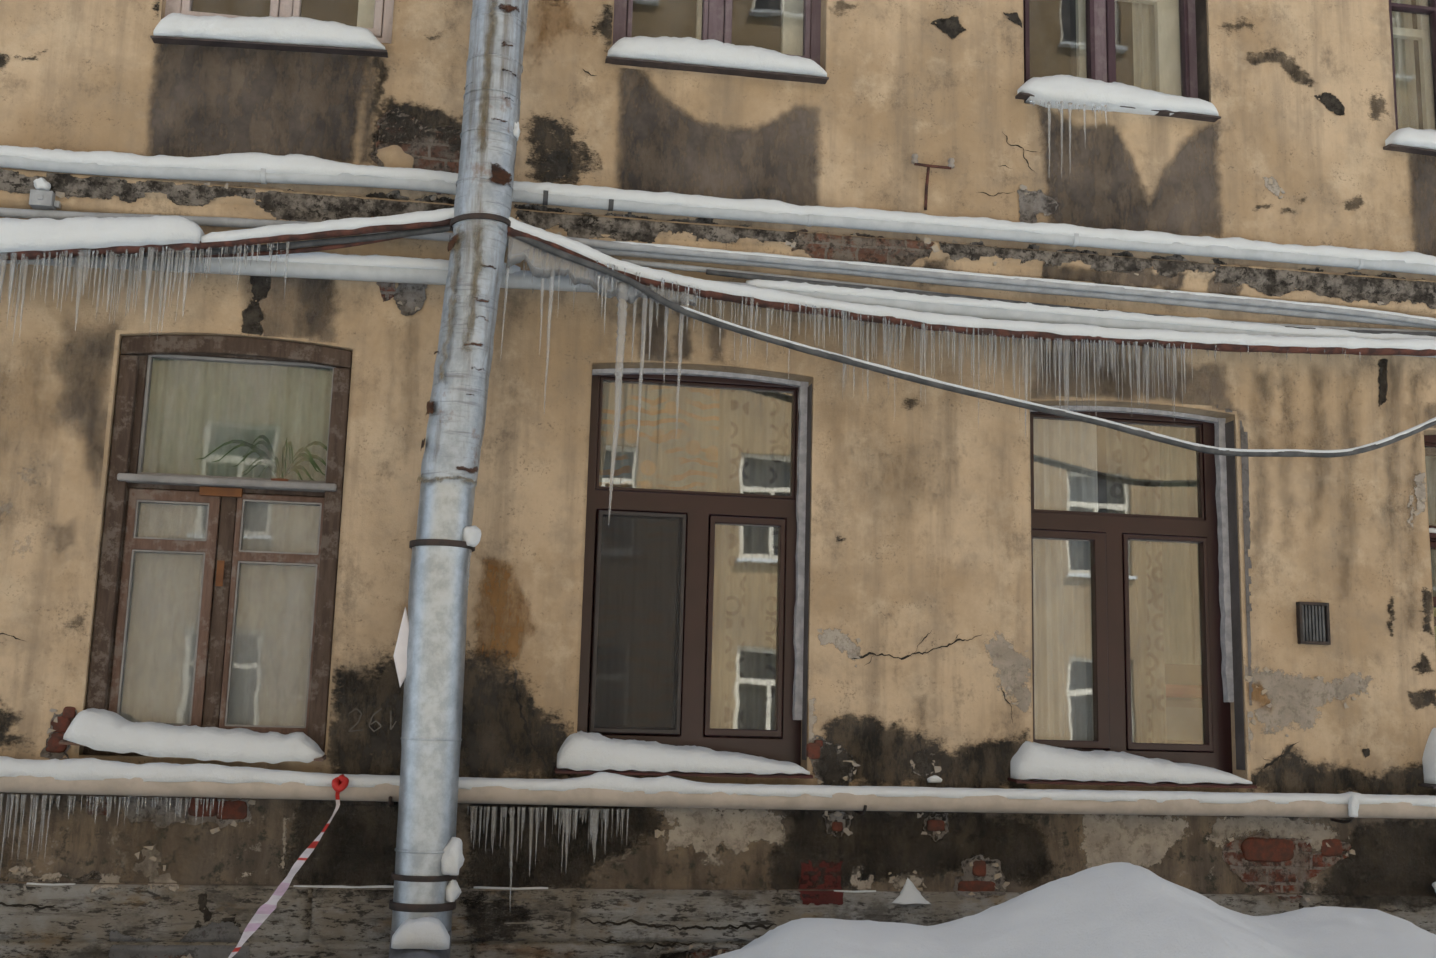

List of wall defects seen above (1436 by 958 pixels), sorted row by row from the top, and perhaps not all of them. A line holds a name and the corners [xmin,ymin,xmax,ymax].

flaking render [931,15,966,39]
flaking render [370,108,462,173]
peeling [817,628,862,667]
crack [852,630,981,664]
damp [0,700,22,750]
flaking render [40,707,77,760]
damp [327,655,404,775]
damp [459,644,576,779]
peeling [1244,665,1373,751]
damp [1250,745,1436,796]
peeling [1079,814,1189,869]
flaking render [1206,816,1356,903]